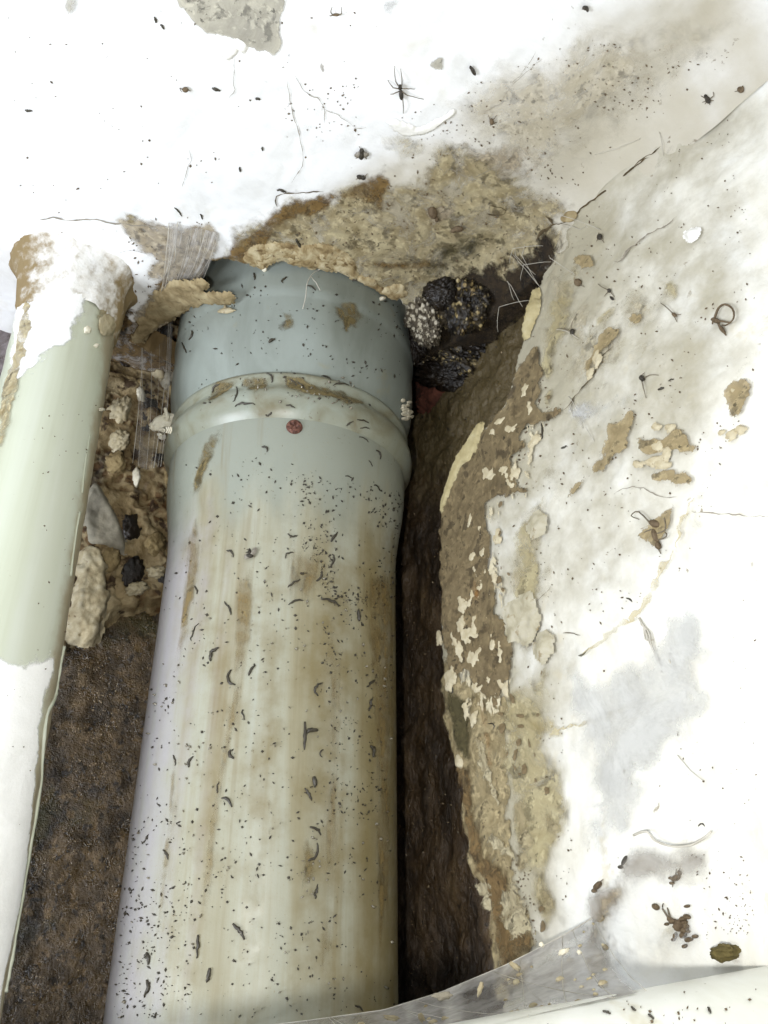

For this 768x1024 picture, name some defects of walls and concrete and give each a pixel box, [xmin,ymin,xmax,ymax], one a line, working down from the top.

peeling [178,0,284,61]
damp [226,52,634,392]
crack [536,148,658,241]
flaking render [243,241,408,301]
peeling [718,379,751,442]
peeling [568,411,695,496]
damp [514,524,539,598]
flaking render [383,284,561,1021]